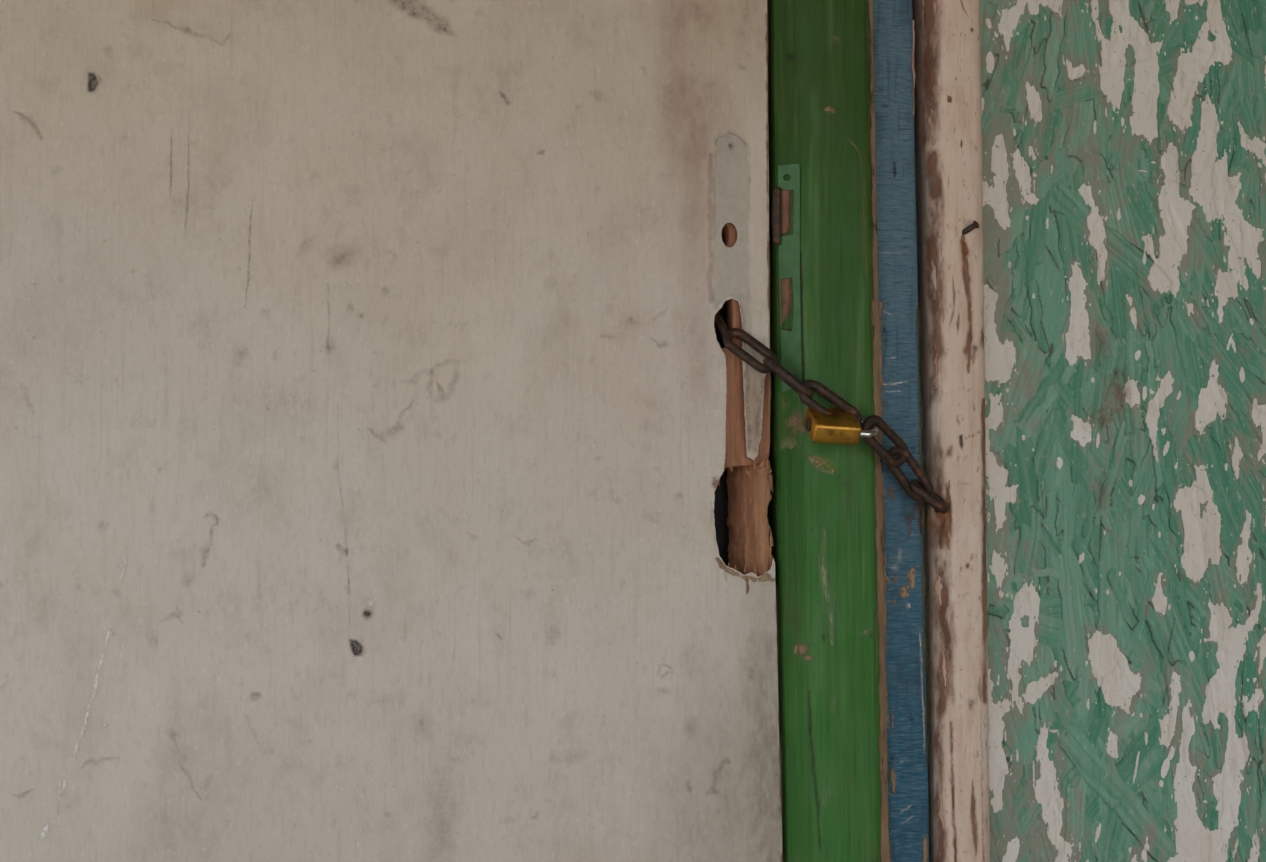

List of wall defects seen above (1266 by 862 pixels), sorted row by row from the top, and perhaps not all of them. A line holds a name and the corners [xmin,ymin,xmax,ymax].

peeling [912,0,1101,862]
peeling [1062,182,1121,383]
peeling [1063,0,1266,329]
peeling [1086,630,1142,759]
peeling [1124,360,1266,862]